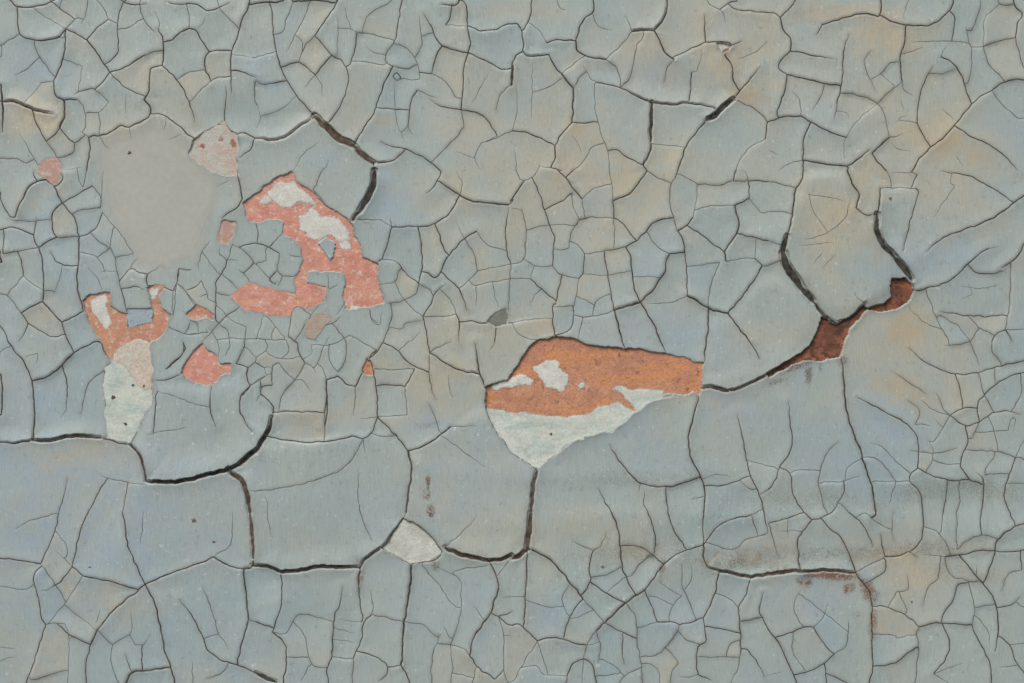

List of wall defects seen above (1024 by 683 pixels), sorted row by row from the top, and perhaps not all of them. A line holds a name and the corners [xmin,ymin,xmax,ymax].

peeling [36,158,62,185]
crack [0,0,410,187]
peeling [189,120,239,176]
crack [237,16,423,221]
peeling [84,284,170,444]
peeling [182,344,231,385]
crack [0,165,575,683]
peeling [217,172,384,340]
peeling [485,336,704,467]
crack [385,0,1024,683]
peeling [767,278,912,377]
peeling [382,519,441,563]